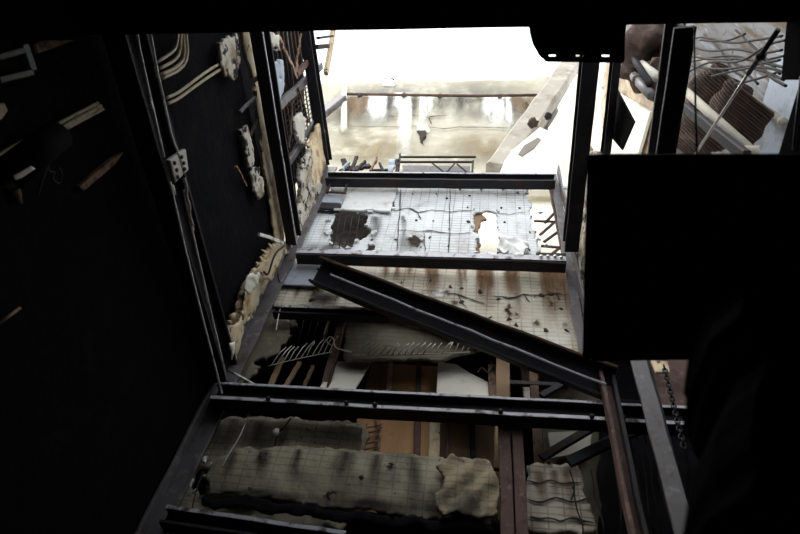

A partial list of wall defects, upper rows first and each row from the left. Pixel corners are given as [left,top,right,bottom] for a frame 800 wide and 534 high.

spalling [344,223,377,251]
rust [477,270,492,290]
rust [505,271,517,293]
rust [542,272,566,305]